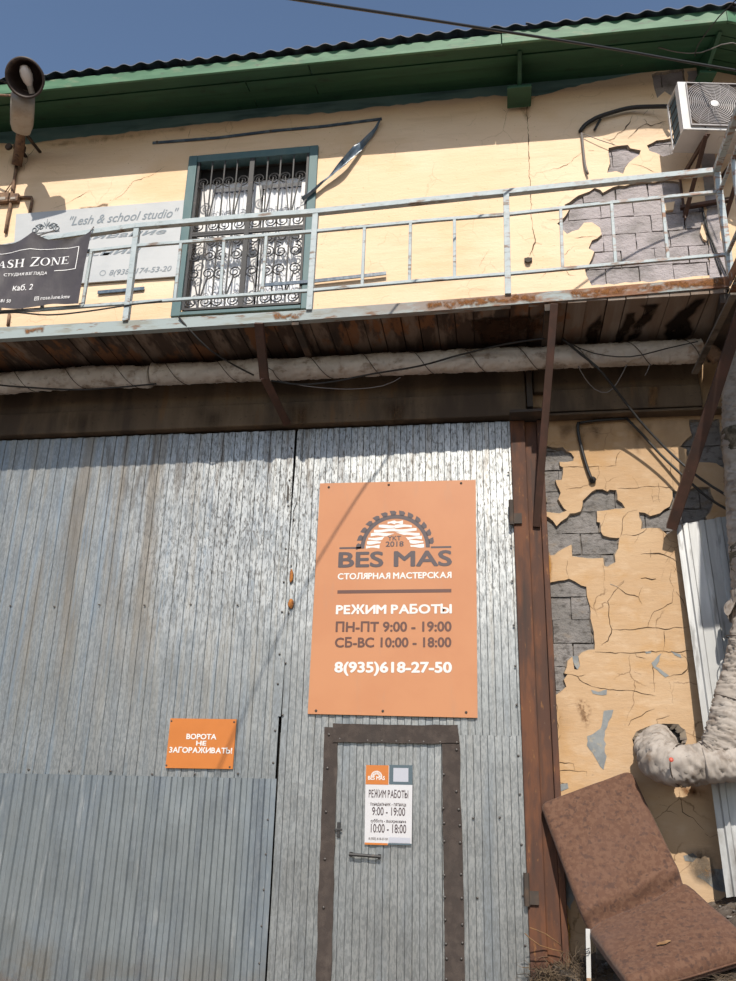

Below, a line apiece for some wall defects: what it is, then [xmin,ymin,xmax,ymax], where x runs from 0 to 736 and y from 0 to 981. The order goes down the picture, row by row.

spalling [652,69,697,98]
crack [504,96,582,254]
spalling [607,138,675,174]
spalling [557,153,726,285]
corrosion [428,294,535,308]
corrosion [571,288,624,297]
corrosion [637,278,724,291]
spalling [545,446,625,567]
spalling [639,487,714,534]
crack [571,461,690,726]
spalling [550,579,595,695]
hole [662,724,687,744]